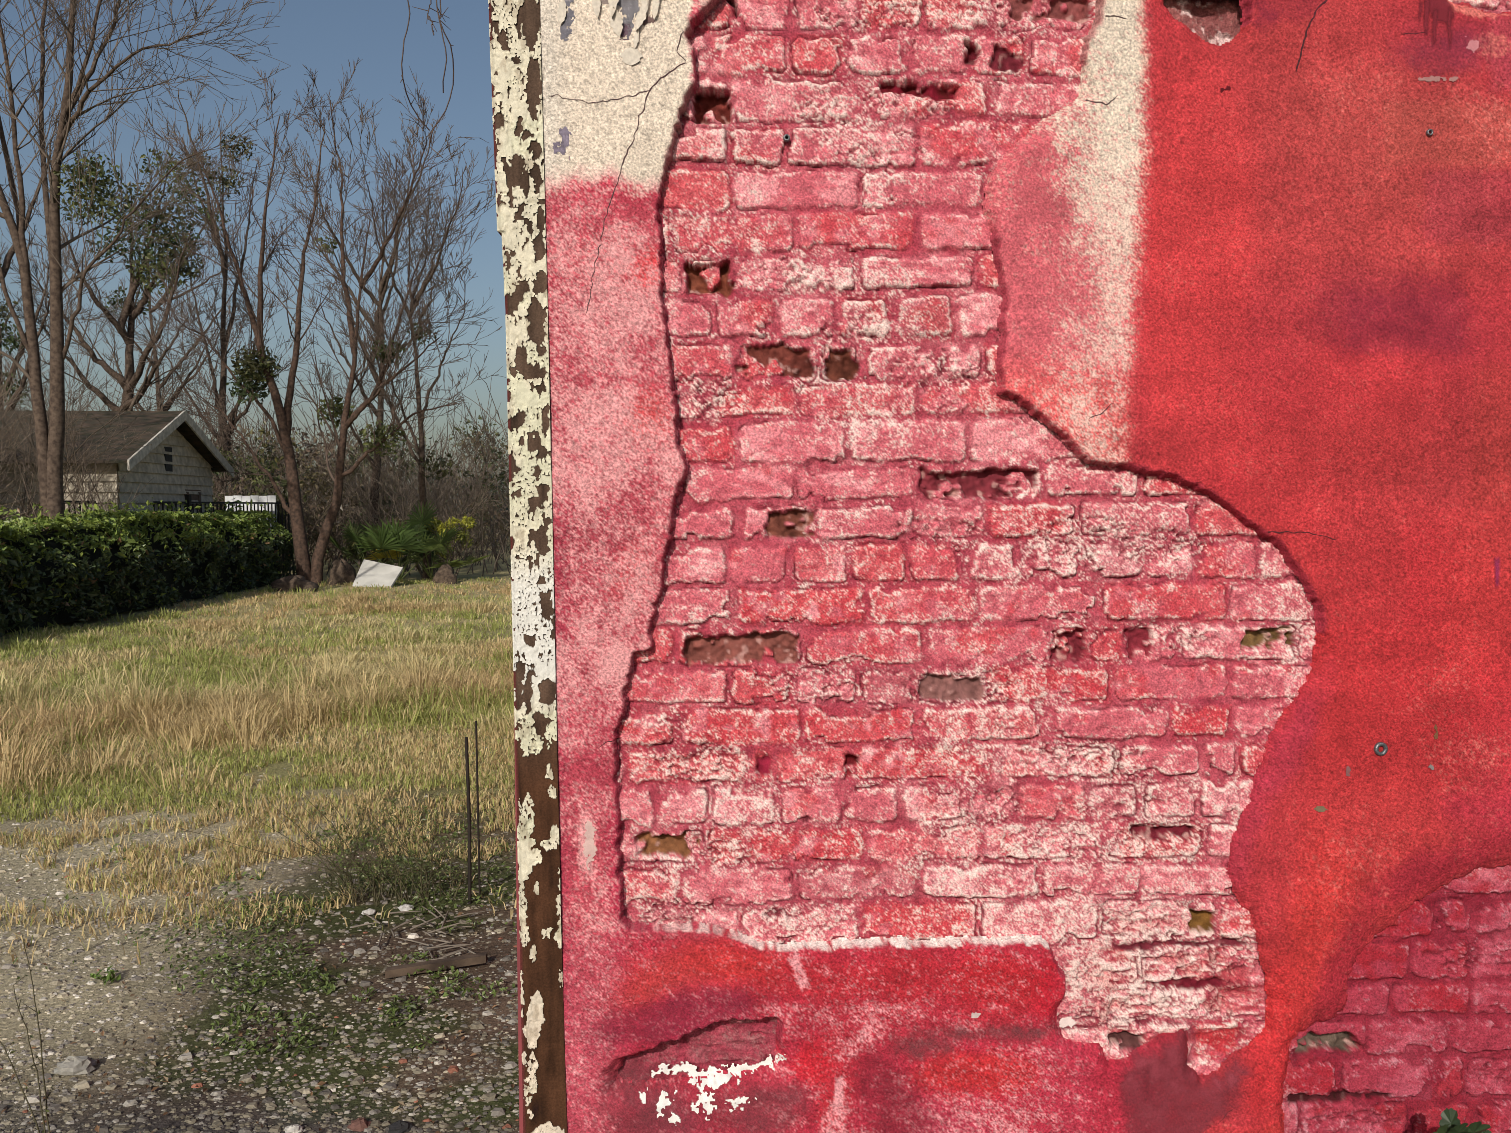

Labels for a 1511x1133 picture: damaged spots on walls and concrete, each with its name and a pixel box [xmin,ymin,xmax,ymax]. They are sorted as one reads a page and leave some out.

peeling [557,0,575,41]
peeling [592,0,665,66]
crack [1296,0,1327,71]
flaking render [1448,0,1511,14]
peeling [488,0,572,1133]
flaking render [616,0,1316,1082]
peeling [582,803,597,870]
flaking render [1282,865,1511,1133]